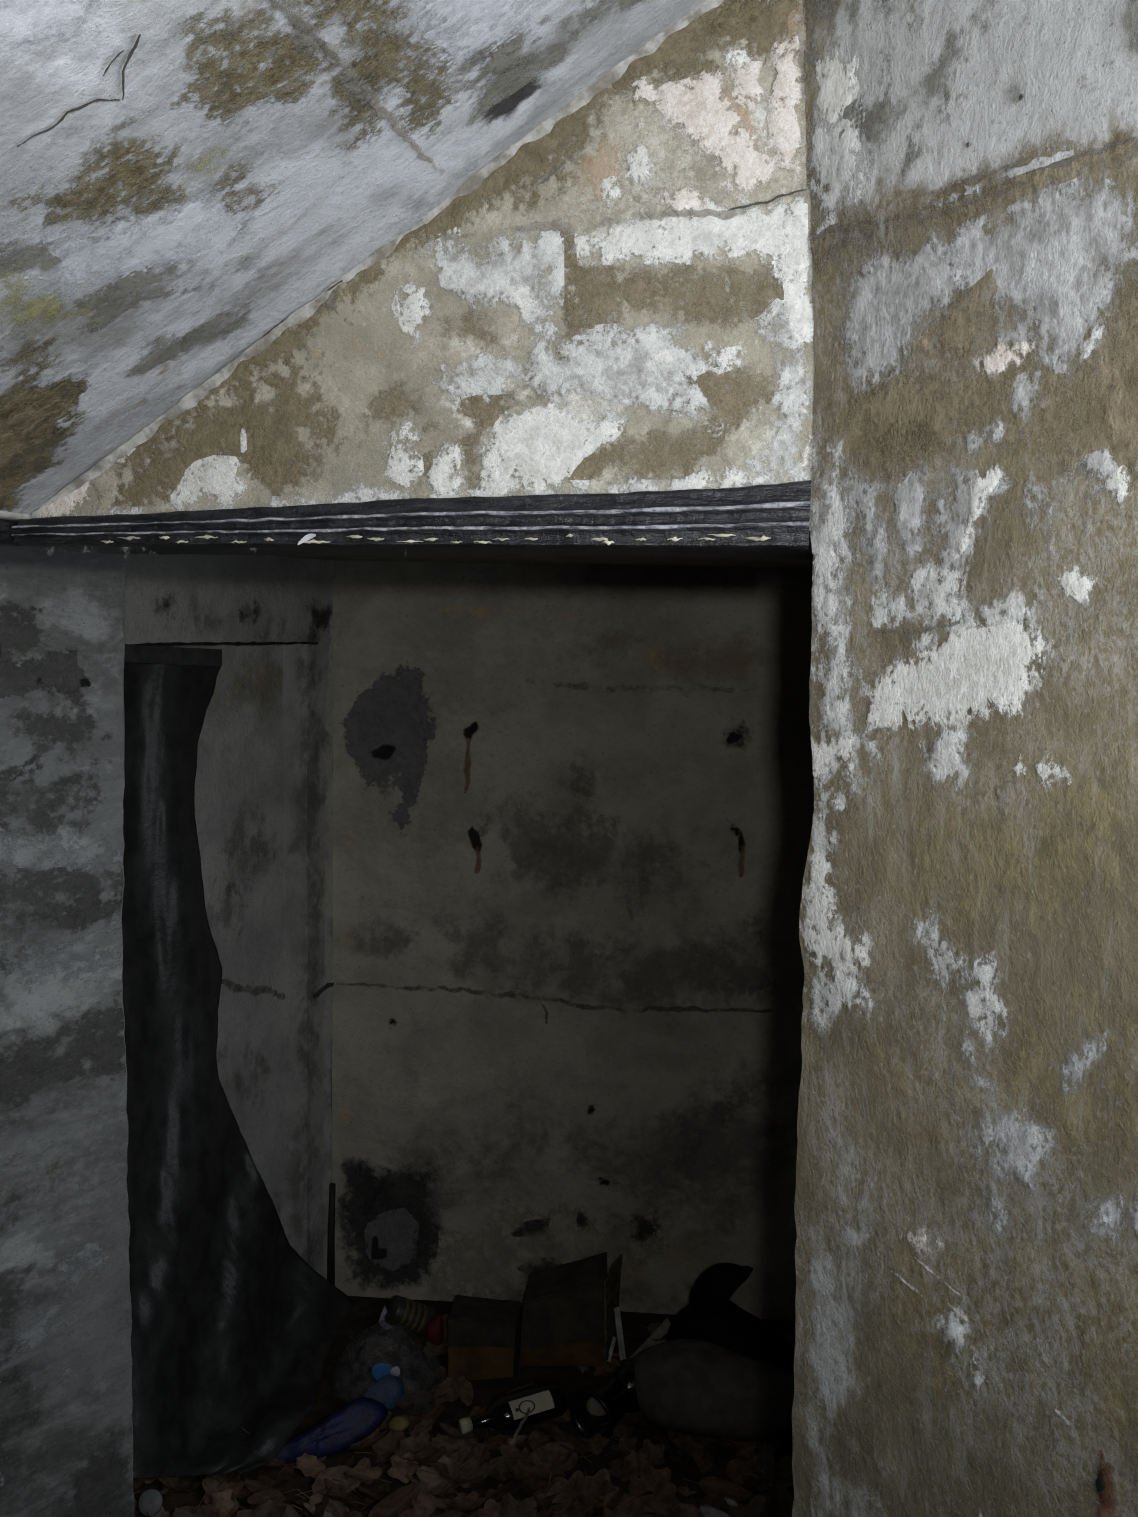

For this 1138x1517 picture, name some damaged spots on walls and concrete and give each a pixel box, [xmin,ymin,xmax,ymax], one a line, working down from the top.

crack [17,34,141,147]
crack [270,0,433,162]
damp [0,240,196,332]
peeling [3,197,235,292]
damp [60,0,806,515]
peeling [168,428,247,510]
peeling [384,25,1138,1031]
damp [0,688,111,835]
rust [463,722,478,793]
rust [468,827,482,873]
crack [222,979,772,1024]
rust [1096,1450,1115,1517]